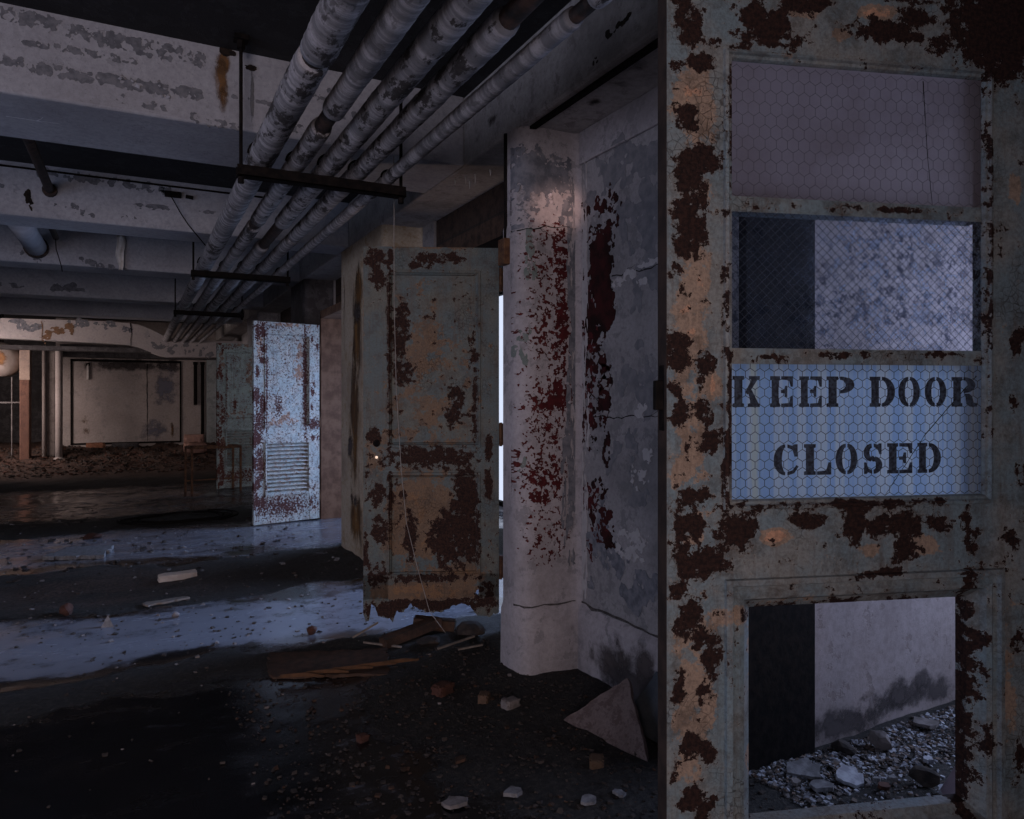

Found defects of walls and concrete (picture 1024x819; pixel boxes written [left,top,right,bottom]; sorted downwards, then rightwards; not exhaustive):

peeling [0,6,239,131]
corrosion [215,54,230,108]
peeling [510,132,658,618]
damp [815,670,948,740]